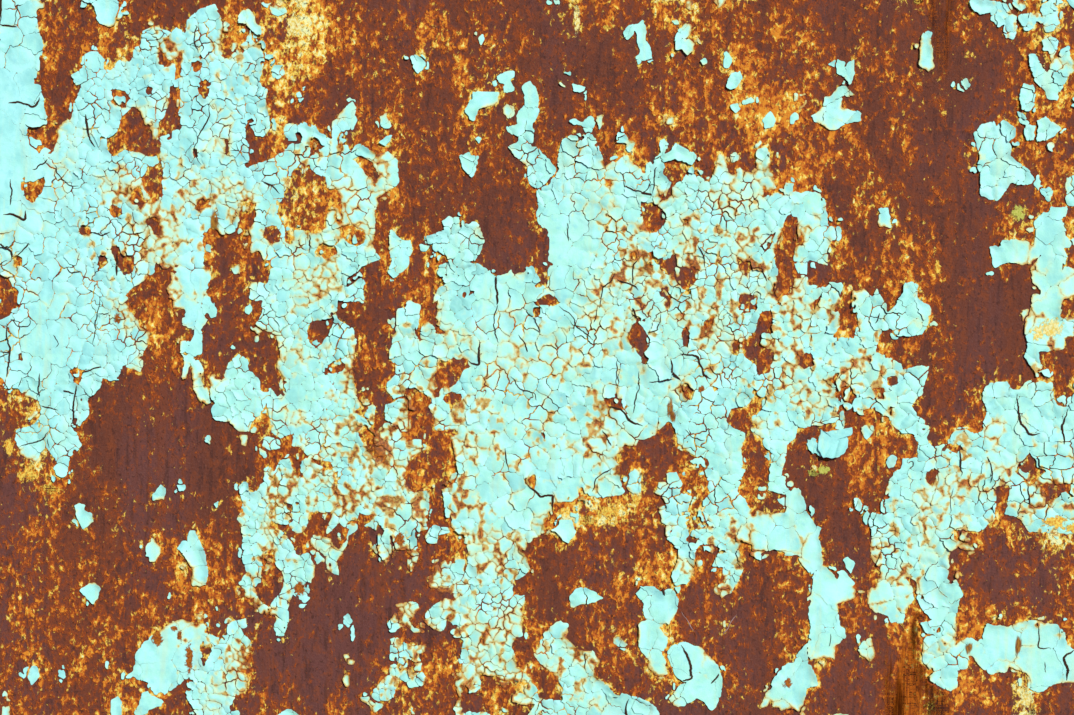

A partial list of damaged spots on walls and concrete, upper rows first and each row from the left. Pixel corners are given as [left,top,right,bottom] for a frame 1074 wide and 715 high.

peeling [970,0,1074,201]
crack [0,160,75,265]
rust [2,437,14,456]
crack [0,297,108,446]
peeling [0,0,450,636]
crack [468,277,540,366]
crack [592,354,711,491]
peeling [387,81,1074,715]
rust [1042,515,1074,533]
rust [151,626,193,675]
peeling [126,614,253,715]
rust [885,611,951,715]